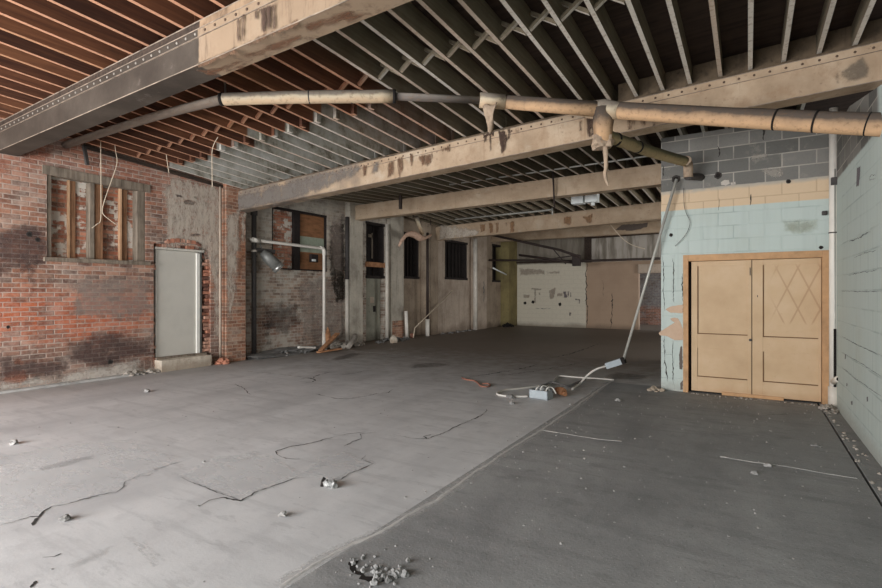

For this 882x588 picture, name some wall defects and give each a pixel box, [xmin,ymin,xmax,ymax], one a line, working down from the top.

peeling [154,179,246,352]
water stain [0,333,154,389]
peeling [659,305,683,369]
crack [403,409,487,439]
crack [4,432,373,526]